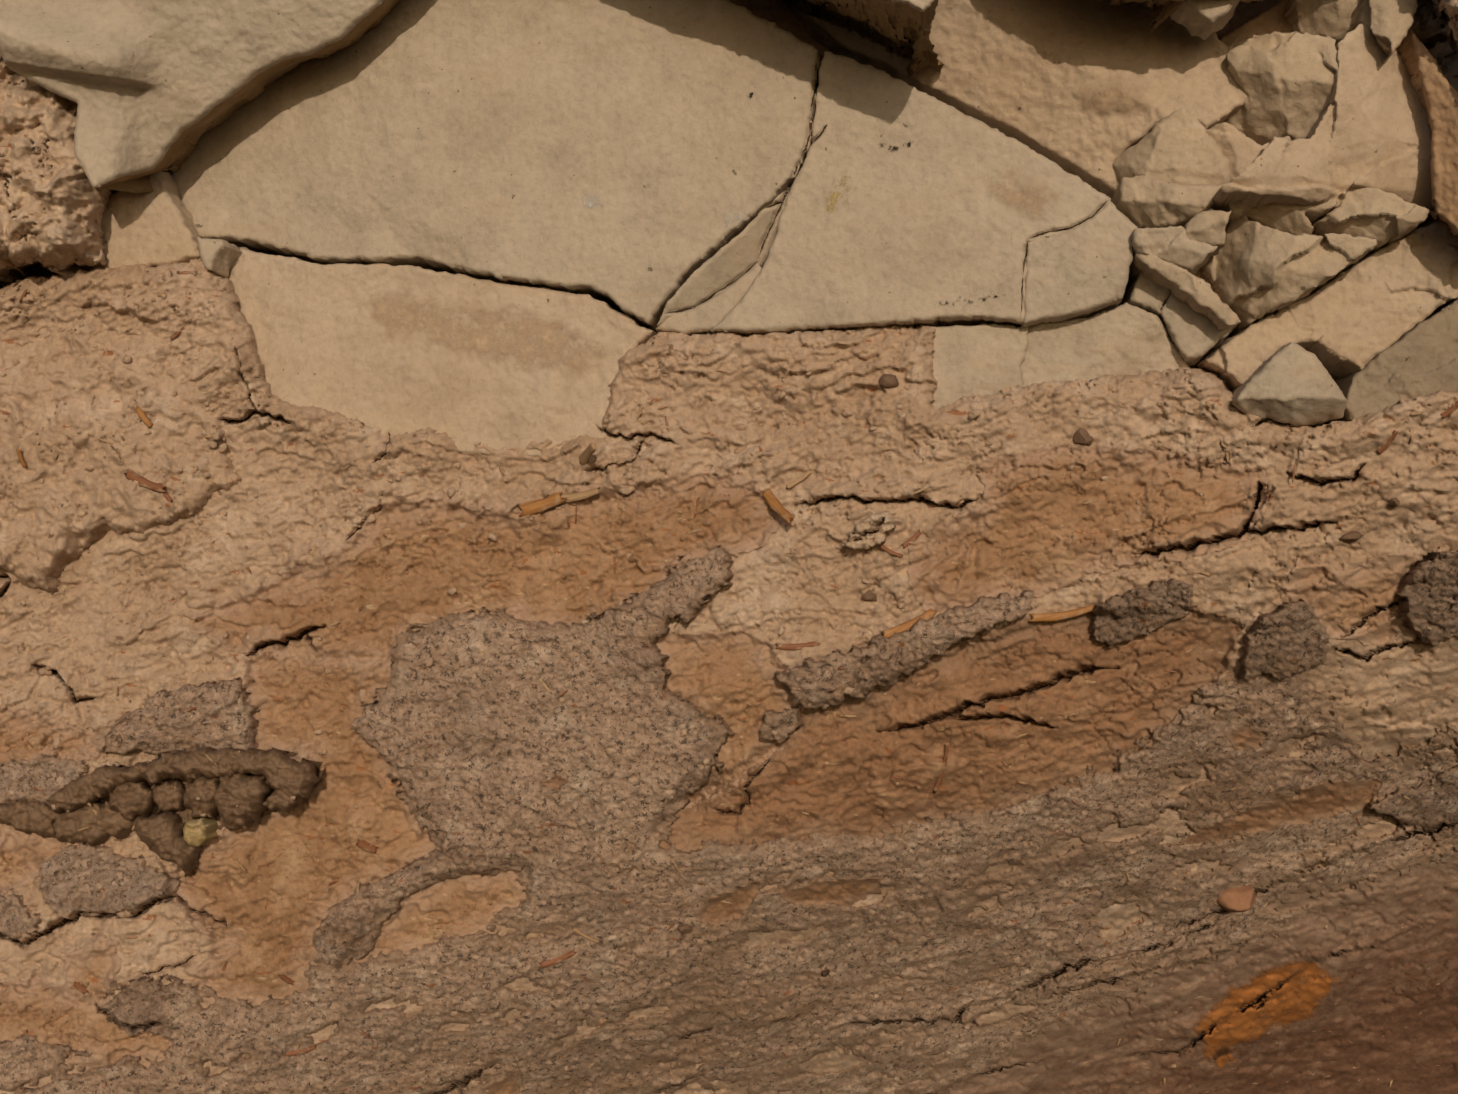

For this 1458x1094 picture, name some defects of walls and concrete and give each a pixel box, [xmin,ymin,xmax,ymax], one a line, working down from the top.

crack [664,62,827,314]
crack [1020,201,1107,316]
crack [220,349,291,424]
crack [797,495,982,542]
crack [1140,464,1365,556]
crack [254,626,326,653]
crack [1332,602,1418,661]
crack [881,666,1117,732]
peeling [0,442,1458,1094]
crack [5,896,227,945]
crack [850,814,1458,1026]
crack [1140,926,1416,1055]